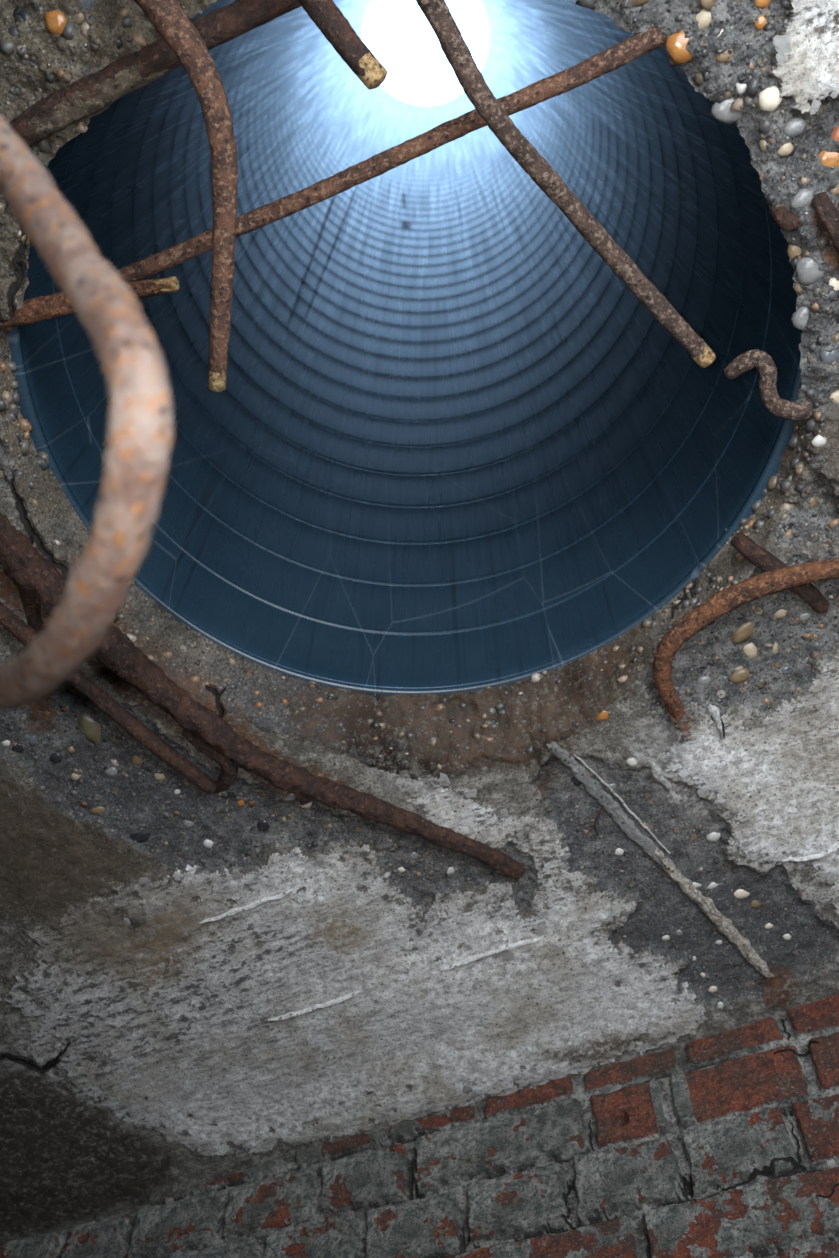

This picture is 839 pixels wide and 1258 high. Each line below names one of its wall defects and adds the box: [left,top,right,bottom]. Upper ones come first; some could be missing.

spalling [0,0,839,985]
rust [285,623,646,795]
peeling [0,581,782,1258]
crack [0,1042,71,1073]
peeling [669,1073,839,1258]
crack [693,1123,839,1201]